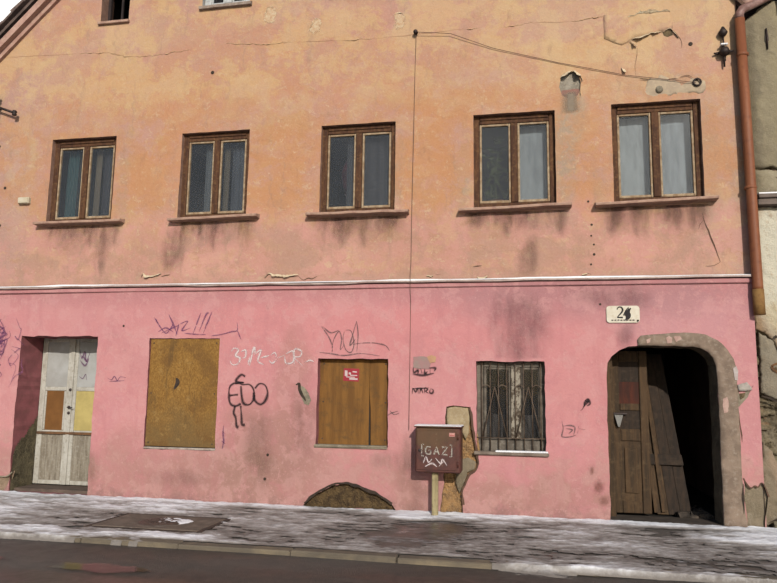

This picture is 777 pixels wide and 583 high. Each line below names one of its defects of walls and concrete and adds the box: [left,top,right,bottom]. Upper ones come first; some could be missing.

spalling [559,70,583,112]
crack [699,213,720,266]
flaking render [723,366,753,437]
spalling [0,416,38,491]
spalling [441,405,480,513]
spalling [304,482,395,510]